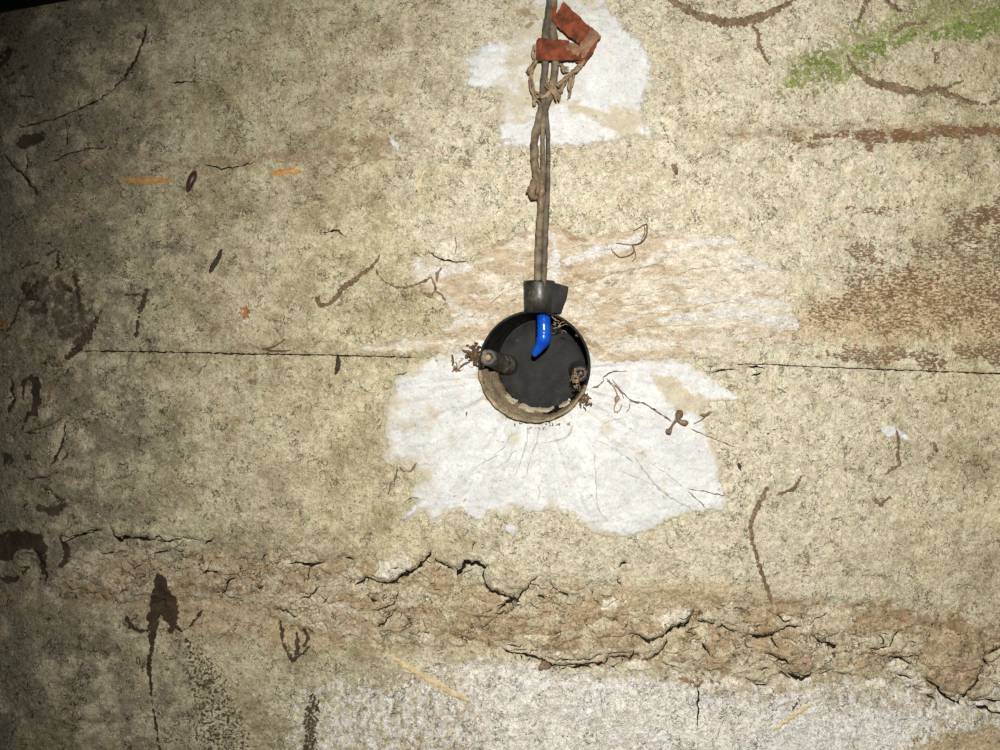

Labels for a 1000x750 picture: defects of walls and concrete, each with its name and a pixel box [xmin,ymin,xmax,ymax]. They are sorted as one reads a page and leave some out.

crack [4,23,147,196]
crack [86,350,413,358]
crack [714,363,1000,376]
damp [0,529,70,584]
crack [62,527,568,628]
damp [125,569,250,750]
crack [503,612,836,685]
crack [694,686,702,729]
crack [871,631,1000,714]